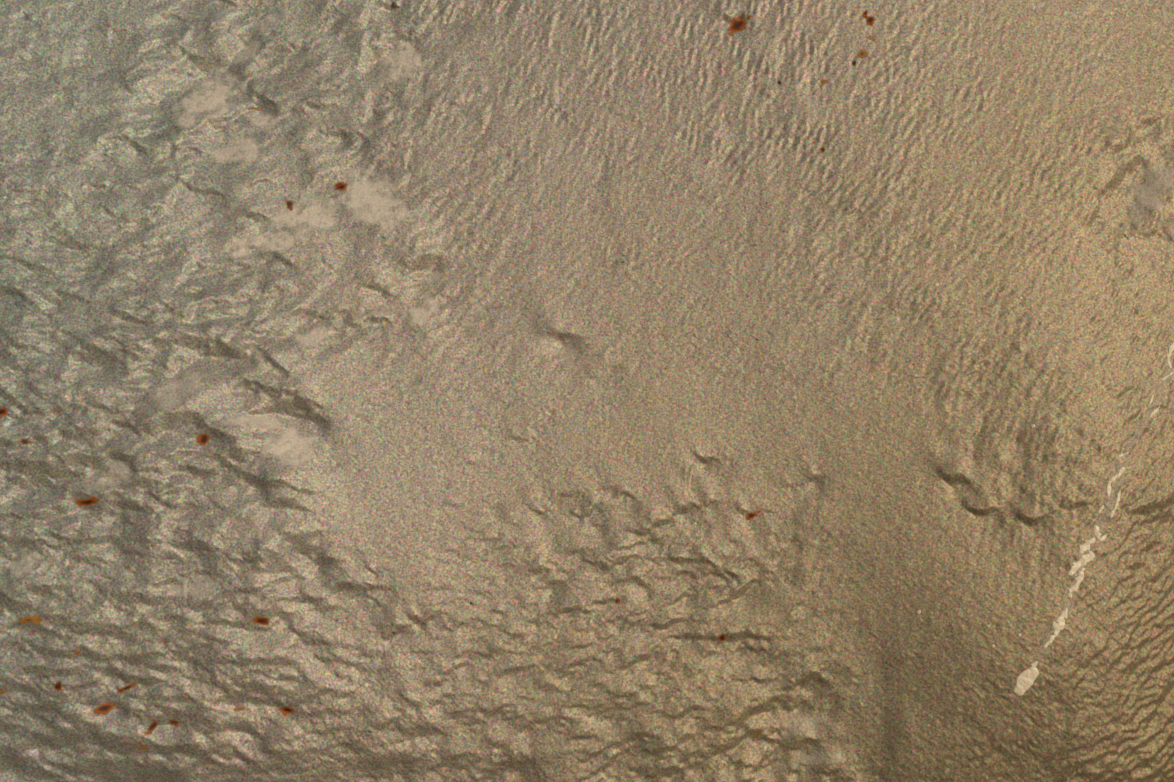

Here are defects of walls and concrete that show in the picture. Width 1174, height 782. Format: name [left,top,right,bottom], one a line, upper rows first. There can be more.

corrosion [729,16,752,36]
corrosion [196,434,209,445]
corrosion [76,497,99,506]
corrosion [254,617,269,625]
corrosion [94,683,136,714]
corrosion [146,720,178,735]